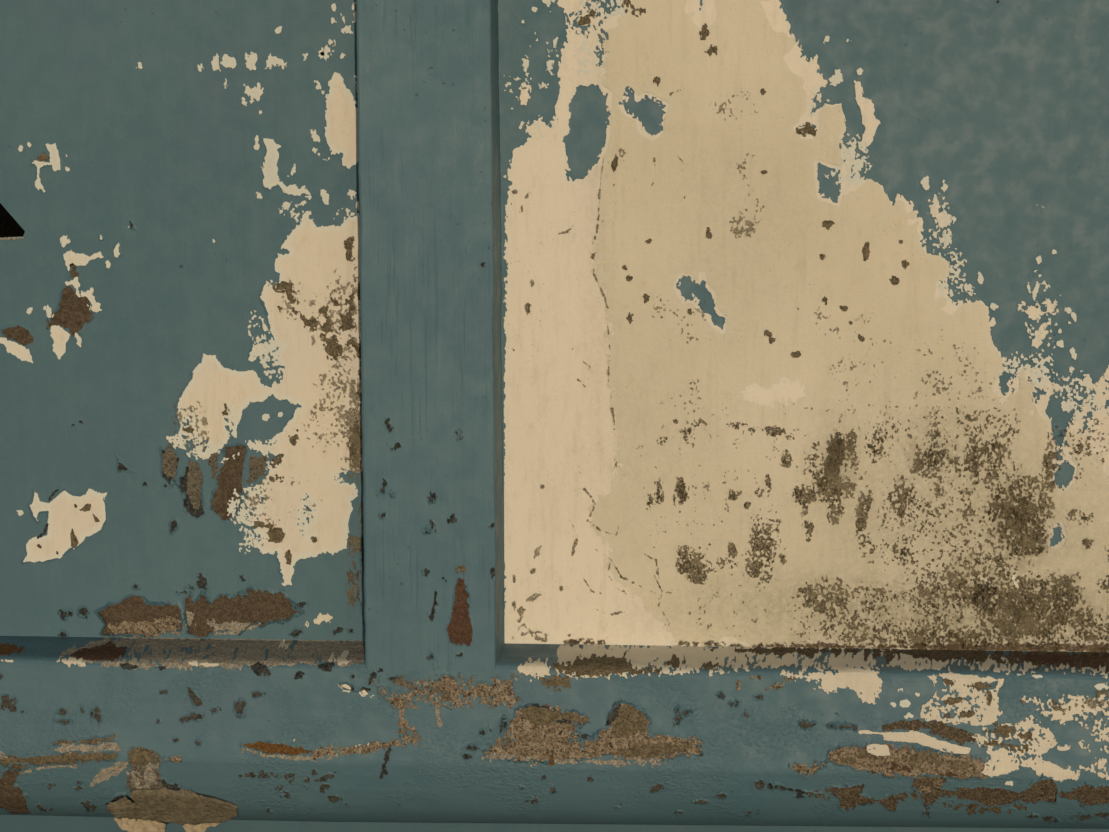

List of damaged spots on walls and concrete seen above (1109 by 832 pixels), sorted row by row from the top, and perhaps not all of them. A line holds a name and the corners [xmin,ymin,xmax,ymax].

damp [729,153,764,238]
peeling [0,233,122,363]
peeling [57,135,365,676]
peeling [236,0,1109,825]
damp [657,381,713,447]
peeling [17,486,110,565]
damp [644,477,709,525]
damp [676,344,1109,652]
corrosion [0,643,24,663]
corrosion [445,562,475,648]
damp [564,634,606,645]
peeling [0,703,237,832]